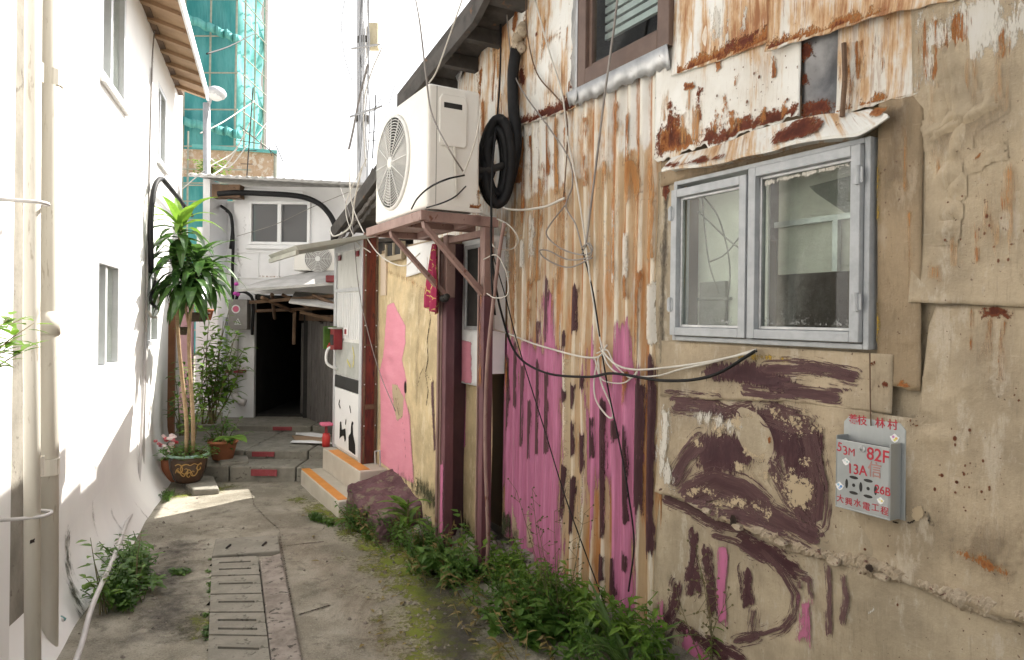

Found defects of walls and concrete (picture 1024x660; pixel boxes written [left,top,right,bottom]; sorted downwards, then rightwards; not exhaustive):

rust [999,29,1010,58]
rust [602,0,967,358]
rust [974,157,1012,263]
rust [970,307,1013,380]
rust [956,550,1008,580]